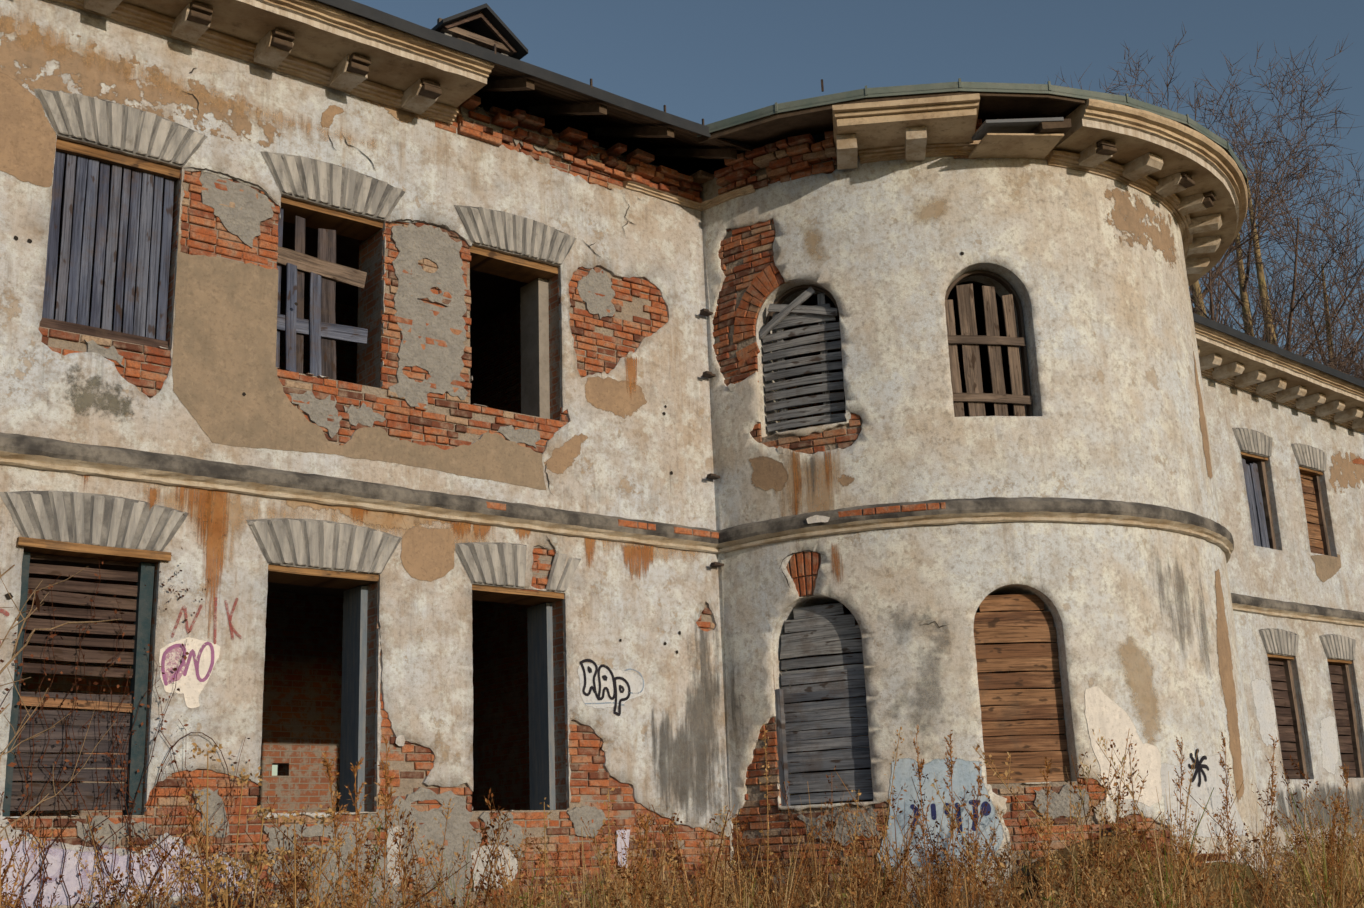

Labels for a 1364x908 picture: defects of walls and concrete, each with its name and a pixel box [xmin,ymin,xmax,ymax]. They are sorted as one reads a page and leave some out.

flaking render [362,95,837,203]
peeling [1104,188,1177,269]
flaking render [38,168,588,490]
spalling [559,266,668,419]
spalling [713,219,786,392]
spalling [749,412,863,491]
peeling [1329,451,1364,494]
spalling [786,551,821,597]
spalling [7,694,890,908]
leakage [652,630,735,821]